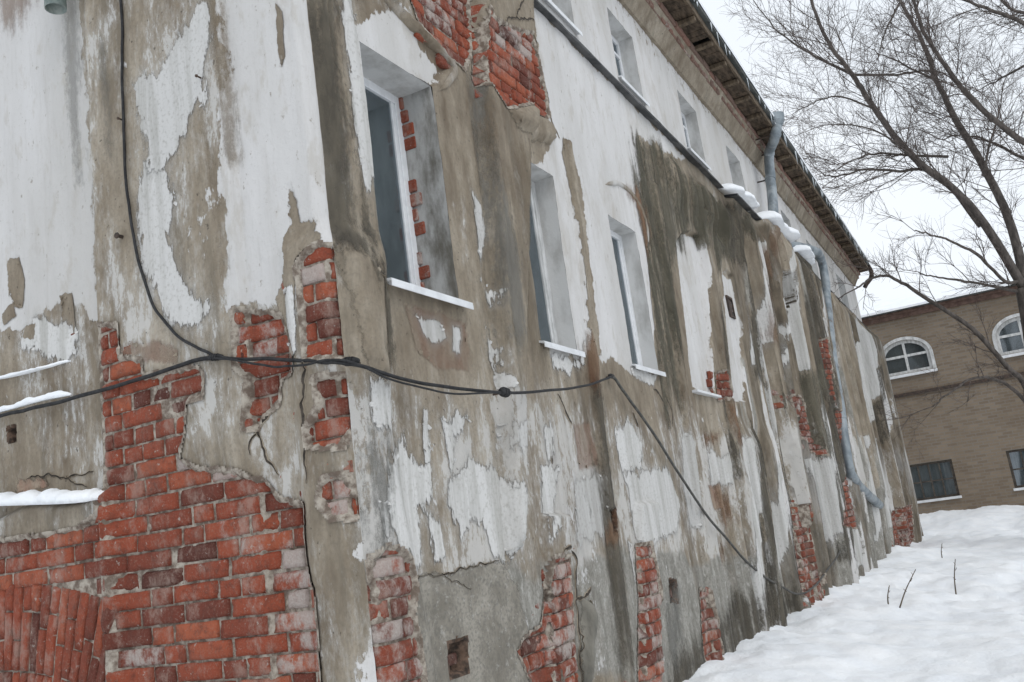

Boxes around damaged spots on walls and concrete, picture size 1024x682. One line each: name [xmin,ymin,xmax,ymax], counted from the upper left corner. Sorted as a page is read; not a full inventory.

crack [27,471,93,487]
peeling [132,1,214,331]
flaking render [0,189,360,682]
crack [248,348,308,483]
flaking render [364,376,528,682]
crack [411,560,499,590]
flaking render [410,0,552,119]
water stain [605,129,764,425]
water stain [674,632,706,682]
flaking render [614,239,864,682]
water stain [719,421,801,653]
water stain [795,240,856,565]